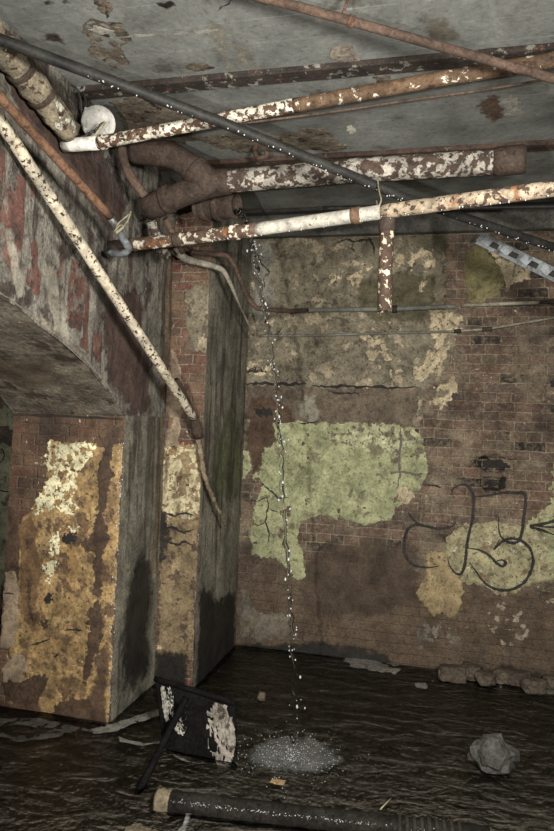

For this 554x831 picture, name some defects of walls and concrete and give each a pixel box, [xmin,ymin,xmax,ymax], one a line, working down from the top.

spalling [82,0,132,70]
peeling [463,247,531,303]
peeling [242,235,465,580]
spalling [474,455,510,493]
crack [245,478,289,542]
peeling [416,464,554,618]
peeling [0,439,123,726]